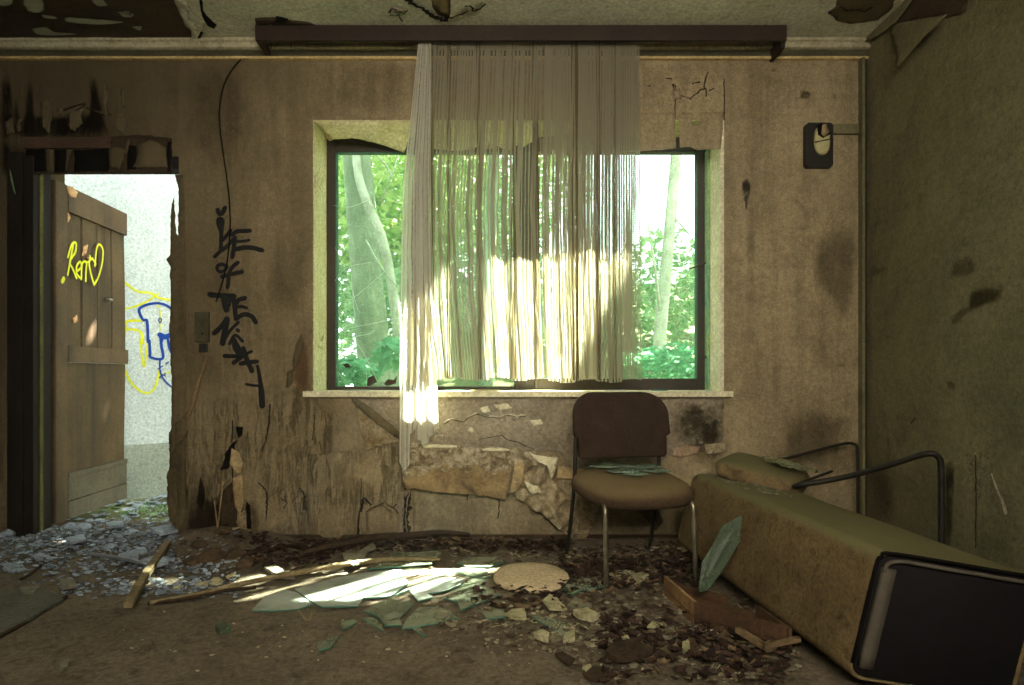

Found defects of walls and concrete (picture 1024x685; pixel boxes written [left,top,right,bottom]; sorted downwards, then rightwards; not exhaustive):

crack [388,0,486,22]
crack [648,72,725,120]
peeling [2,83,168,172]
damp [971,290,998,308]
crack [444,412,534,449]
flaking render [359,398,728,469]
damp [681,410,719,458]
spalling [212,427,252,529]
peeling [412,488,564,534]